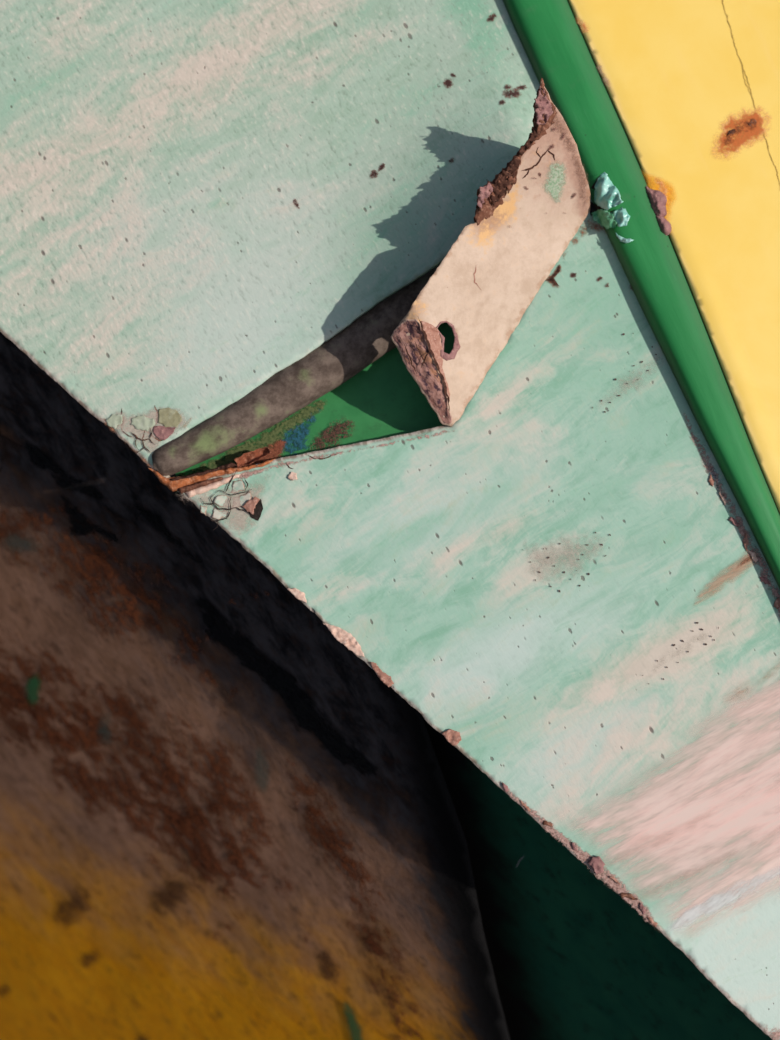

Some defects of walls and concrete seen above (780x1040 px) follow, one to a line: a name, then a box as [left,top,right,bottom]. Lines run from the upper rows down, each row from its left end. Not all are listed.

peeling [477,86,553,208]
corrosion [715,108,769,157]
corrosion [645,175,675,236]
peeling [105,408,183,451]
peeling [169,447,272,529]
corrosion [686,416,780,616]
peeling [287,588,307,603]
peeling [196,597,377,776]
peeling [323,623,394,687]
peeling [442,729,462,746]
corrosion [0,642,294,937]
peeling [588,856,605,875]